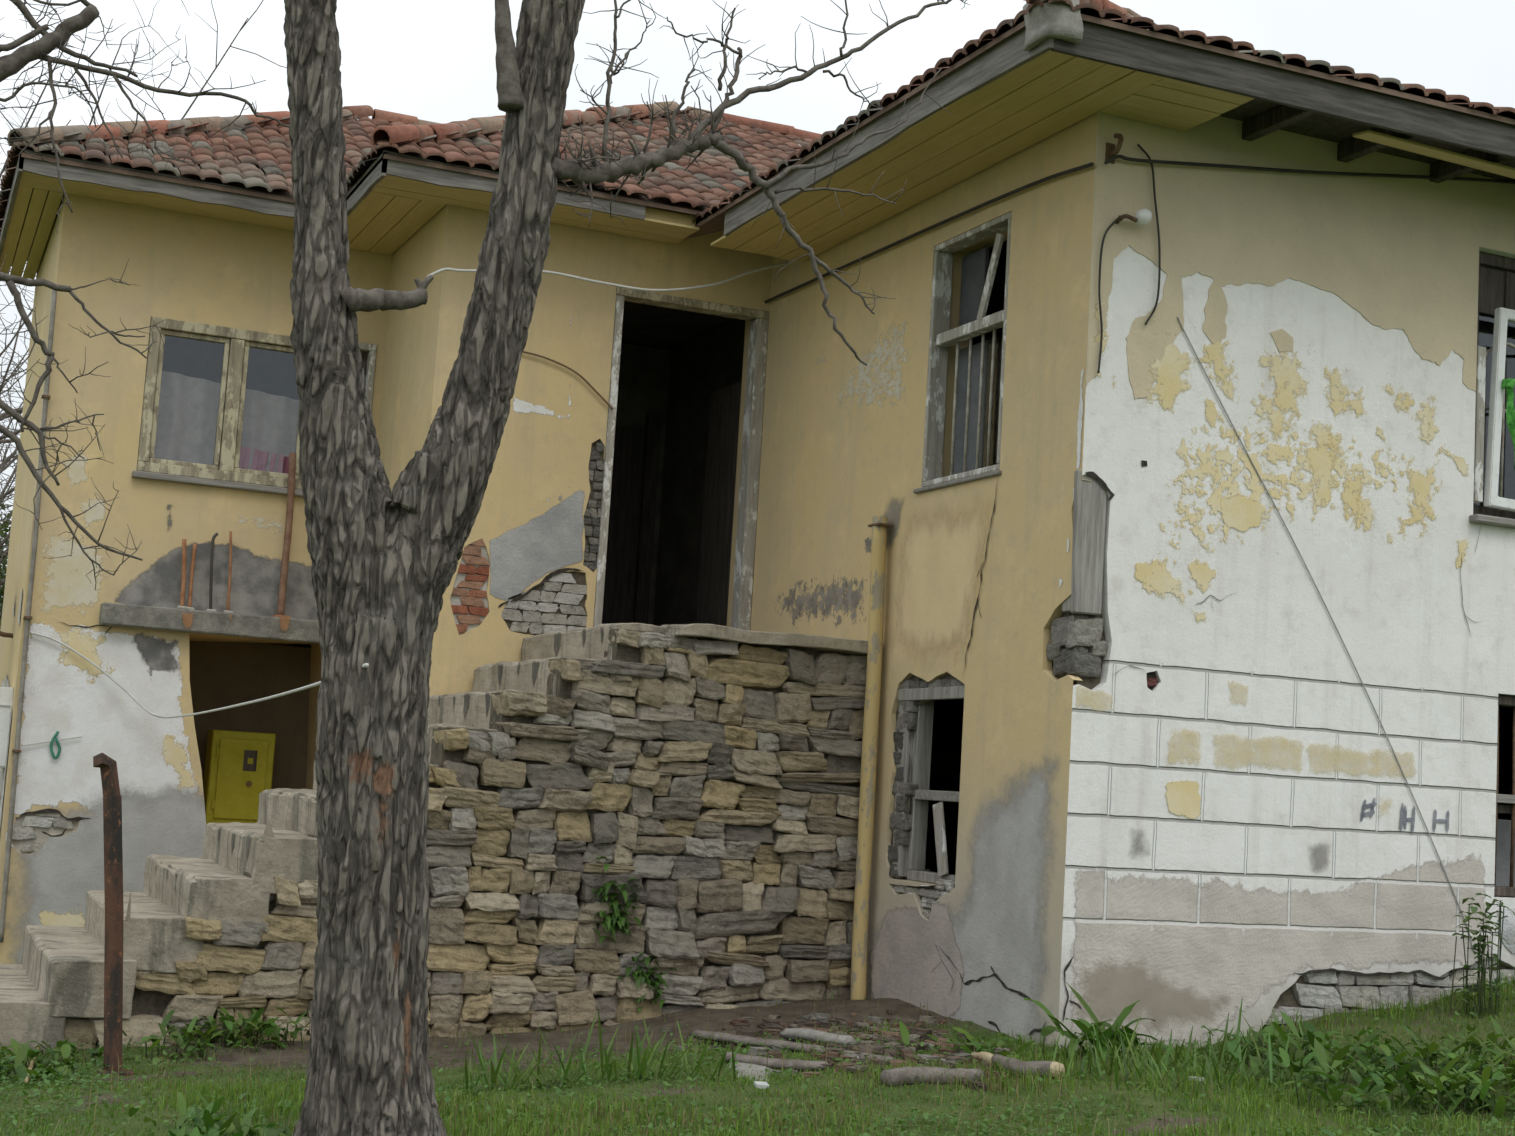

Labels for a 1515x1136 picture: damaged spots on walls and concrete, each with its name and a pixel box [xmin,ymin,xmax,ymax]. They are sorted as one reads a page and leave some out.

peeling [64,453,89,487]
flaking render [450,439,606,636]
leakage [778,575,867,626]
peeling [1046,112,1515,710]
peeling [0,499,206,964]
flaking render [869,674,1054,1044]
crack [932,942,1082,1036]
peeling [1166,731,1415,819]
peeling [1069,853,1514,1043]